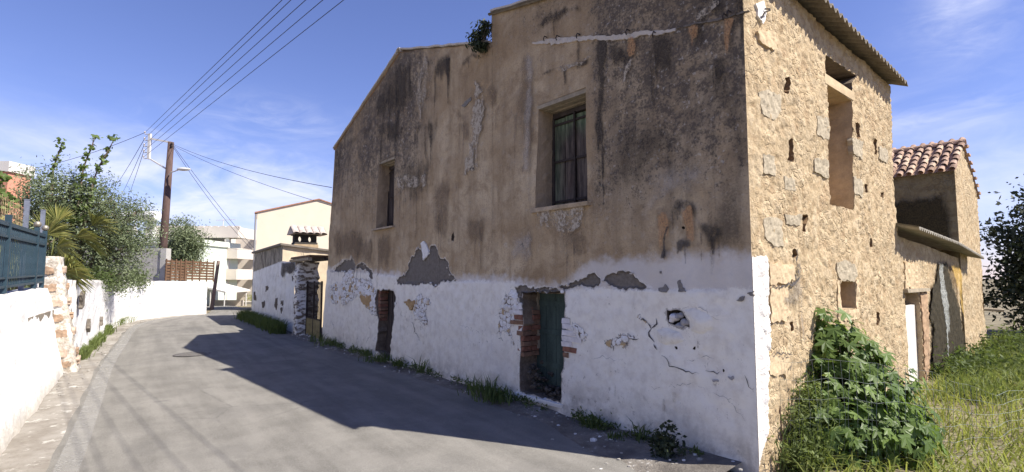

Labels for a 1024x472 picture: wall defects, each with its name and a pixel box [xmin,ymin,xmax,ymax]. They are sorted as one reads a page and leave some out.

peeling [461,81,484,175]
water stain [517,40,630,201]
water stain [661,202,719,259]
flaking render [335,258,373,279]
flaking render [397,241,456,288]
flaking render [516,271,686,311]
crack [603,318,751,417]